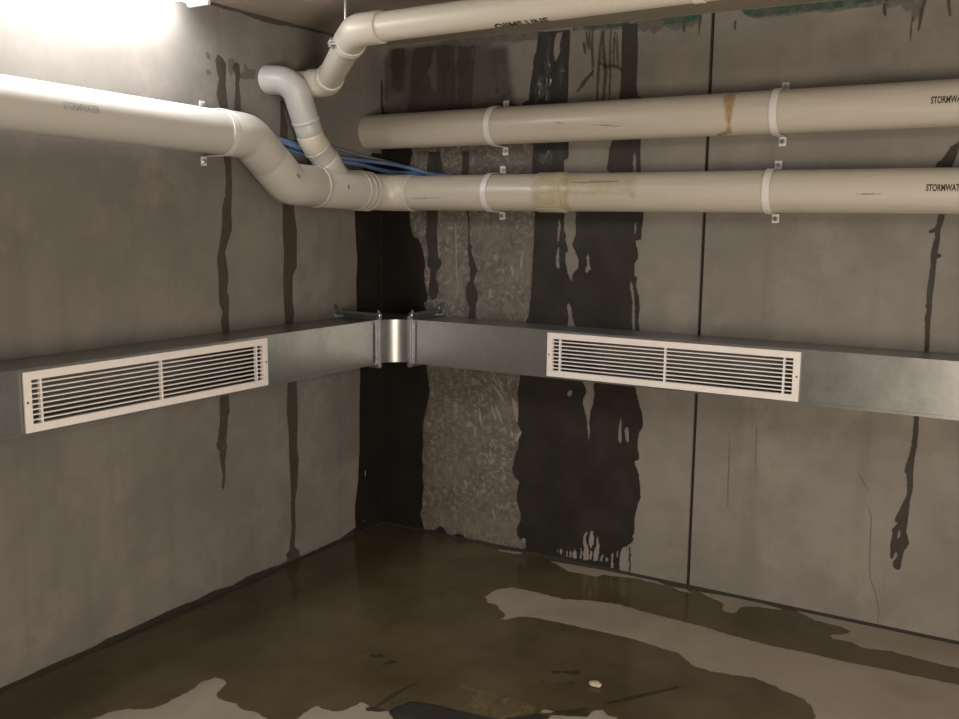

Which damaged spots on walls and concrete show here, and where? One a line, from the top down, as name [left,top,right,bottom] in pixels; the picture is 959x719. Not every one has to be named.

leakage [216,55,241,112]
leakage [280,101,288,147]
leakage [589,22,641,100]
leakage [607,139,641,173]
leakage [936,142,959,168]
leakage [217,156,232,332]
leakage [283,203,297,324]
leakage [355,210,644,331]
leakage [924,214,945,352]
leakage [29,381,300,676]
leakage [319,362,643,573]
leakage [890,416,919,570]